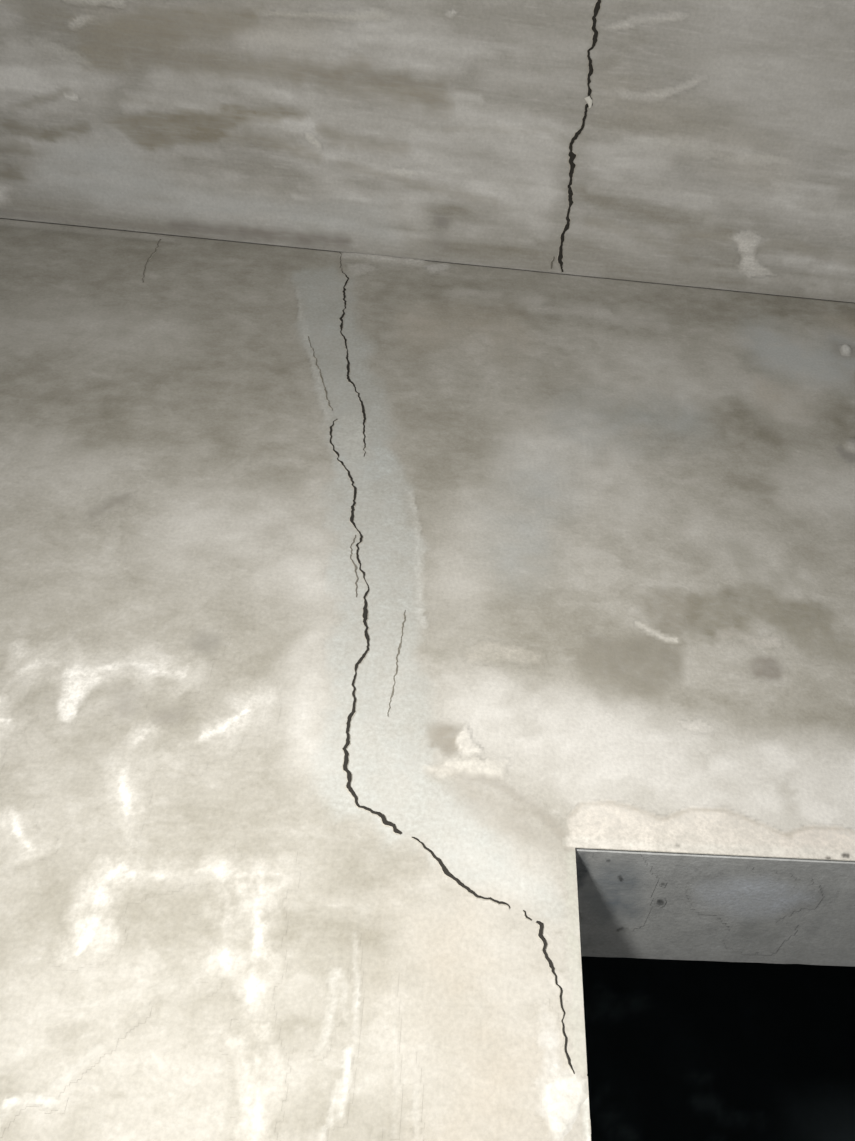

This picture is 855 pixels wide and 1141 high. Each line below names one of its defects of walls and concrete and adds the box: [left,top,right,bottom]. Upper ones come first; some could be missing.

crack [425,0,851,303]
damp [0,625,302,1141]
crack [0,218,575,1074]
damp [309,929,365,1141]